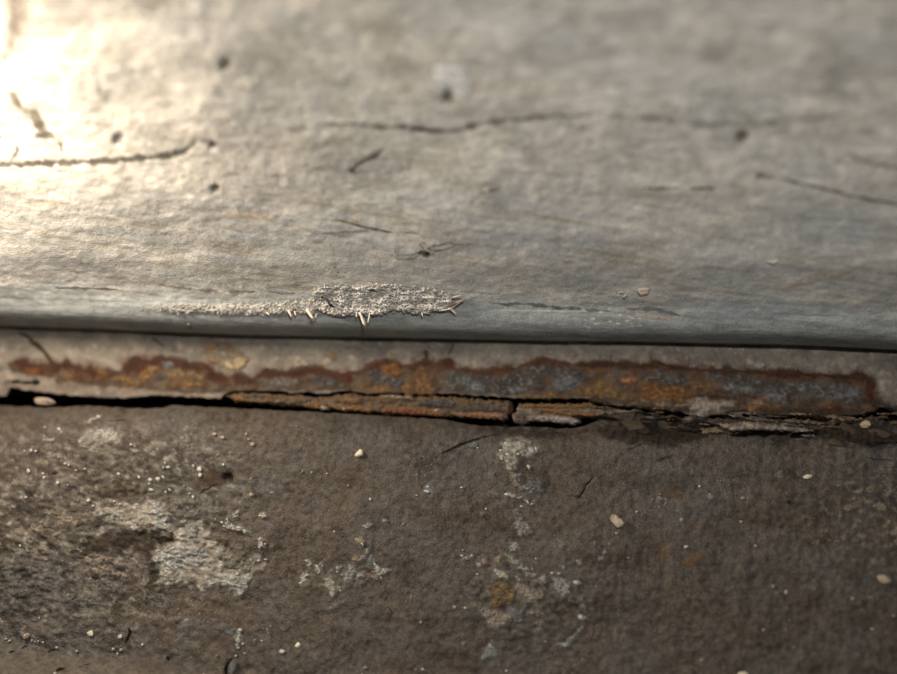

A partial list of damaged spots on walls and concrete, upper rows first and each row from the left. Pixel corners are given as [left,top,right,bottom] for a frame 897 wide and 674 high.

crack [0,141,195,167]
crack [0,333,53,385]
rust [8,350,876,417]
crack [436,434,493,458]
crack [572,398,608,420]
crack [632,405,897,462]
peeling [729,413,850,441]
damp [0,415,268,619]